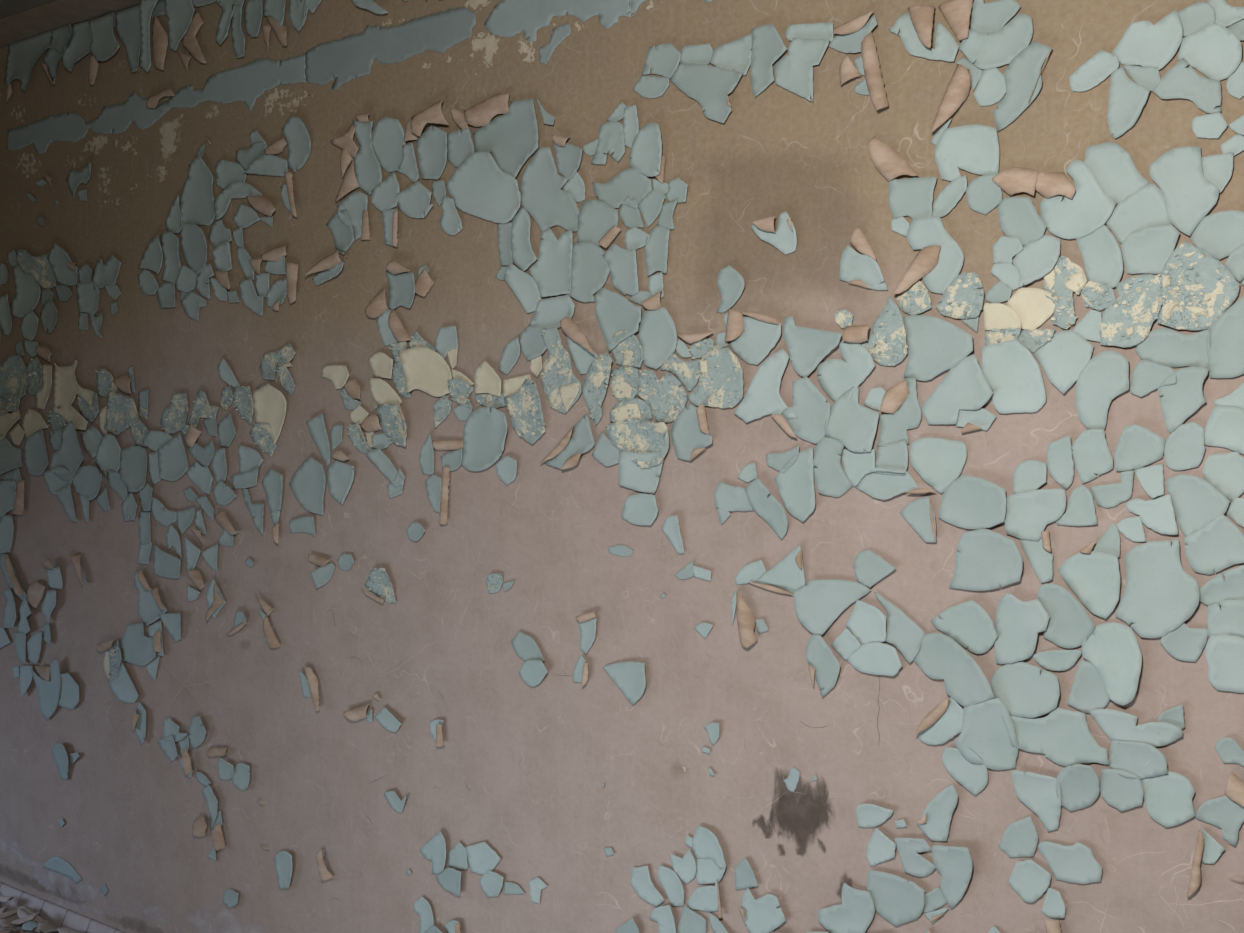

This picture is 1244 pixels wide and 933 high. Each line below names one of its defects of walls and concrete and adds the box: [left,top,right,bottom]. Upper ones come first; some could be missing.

peeling [4,0,646,154]
peeling [26,162,91,206]
peeling [138,116,311,321]
peeling [0,243,296,744]
peeling [289,0,1244,933]
peeling [51,743,80,780]
peeling [157,716,250,861]
damp [752,772,828,855]